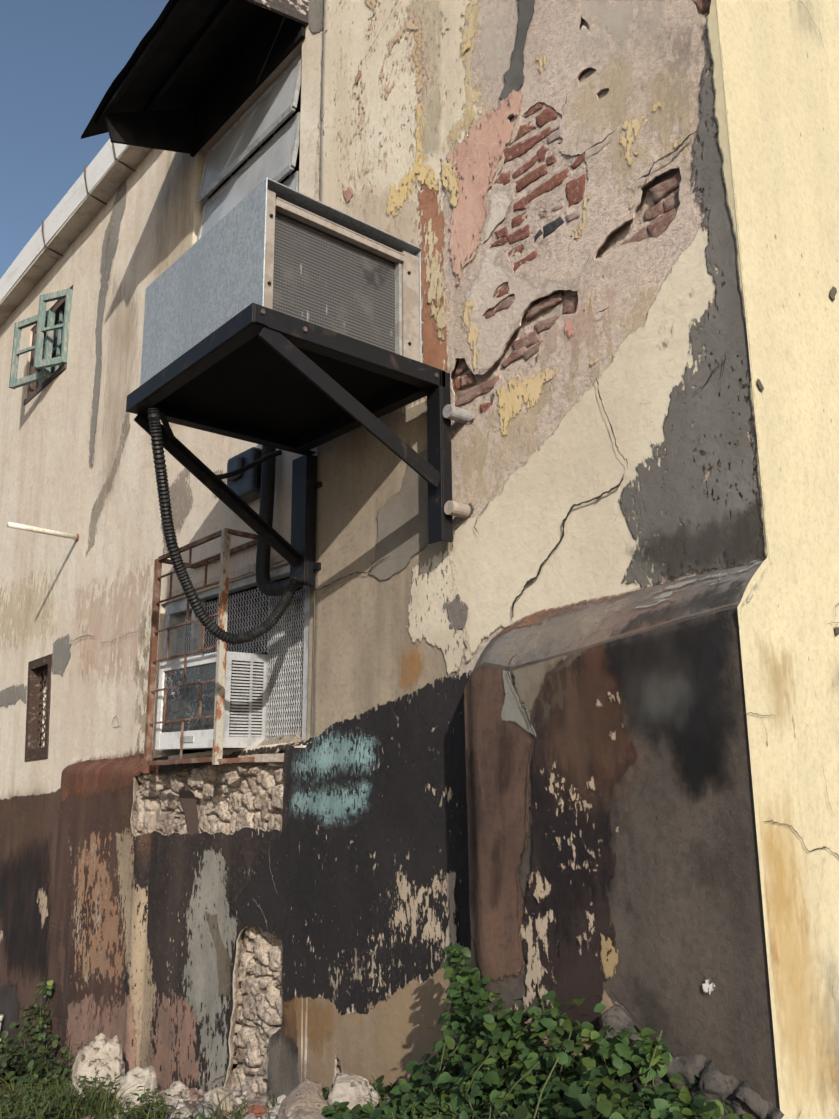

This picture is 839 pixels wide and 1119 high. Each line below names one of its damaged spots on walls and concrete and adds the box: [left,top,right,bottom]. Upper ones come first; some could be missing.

spalling [334,0,589,423]
spalling [596,168,681,258]
crack [511,377,628,618]
peeling [406,550,473,675]
corrosion [60,751,157,802]
spalling [68,735,302,994]
peeling [540,762,601,885]
crack [764,820,839,857]
spalling [228,927,283,1093]
peeling [328,865,459,1005]
peeling [515,867,556,1011]
peeling [577,902,618,979]